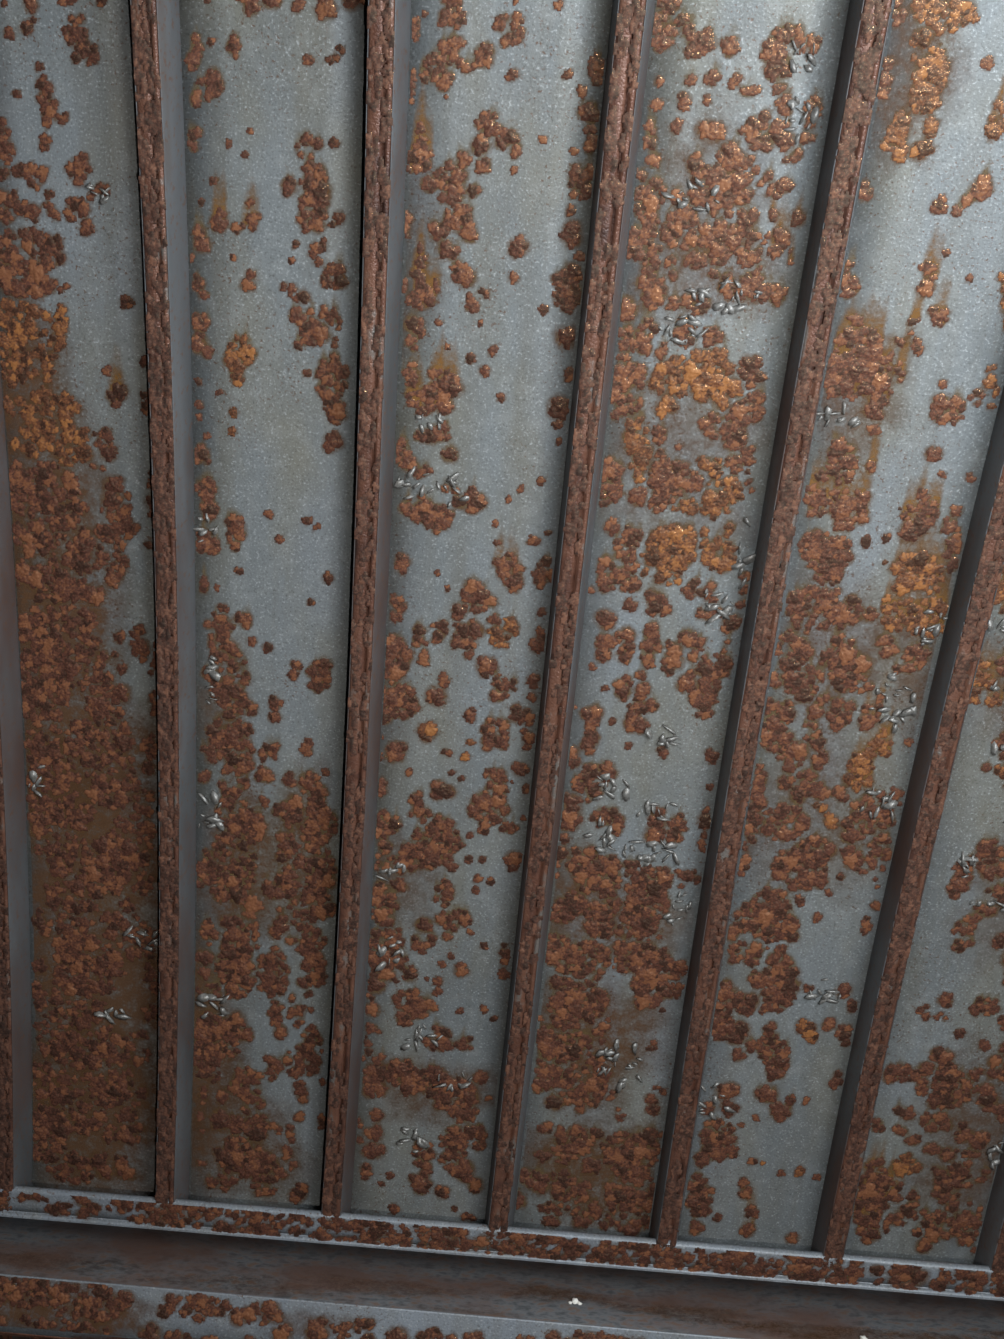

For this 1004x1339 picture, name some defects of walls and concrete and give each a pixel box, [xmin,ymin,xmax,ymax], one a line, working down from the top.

rust [35,61,69,152]
rust [190,176,262,575]
rust [280,132,350,454]
rust [395,0,525,535]
rust [651,0,742,59]
rust [877,0,980,163]
rust [929,168,993,218]
rust [929,364,1001,427]
rust [380,569,541,777]
rust [491,519,553,594]
rust [531,23,823,1122]
rust [192,603,338,1197]